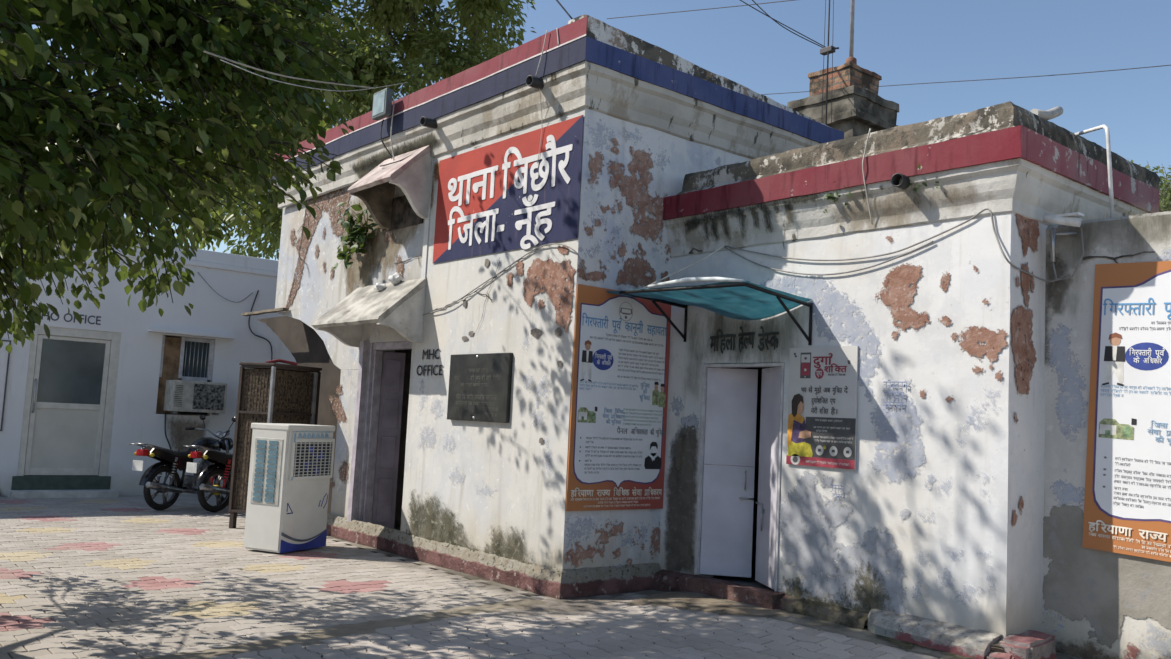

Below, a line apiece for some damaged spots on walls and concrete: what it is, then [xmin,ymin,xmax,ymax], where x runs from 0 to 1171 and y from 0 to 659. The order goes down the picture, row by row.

flaking render [286,189,351,308]
flaking render [506,138,671,339]
peeling [760,213,1088,490]
damp [409,491,533,564]
flaking render [564,521,661,567]
damp [666,424,698,572]
peeling [779,469,907,614]
flaking render [1012,496,1024,526]
damp [1056,642,1119,659]